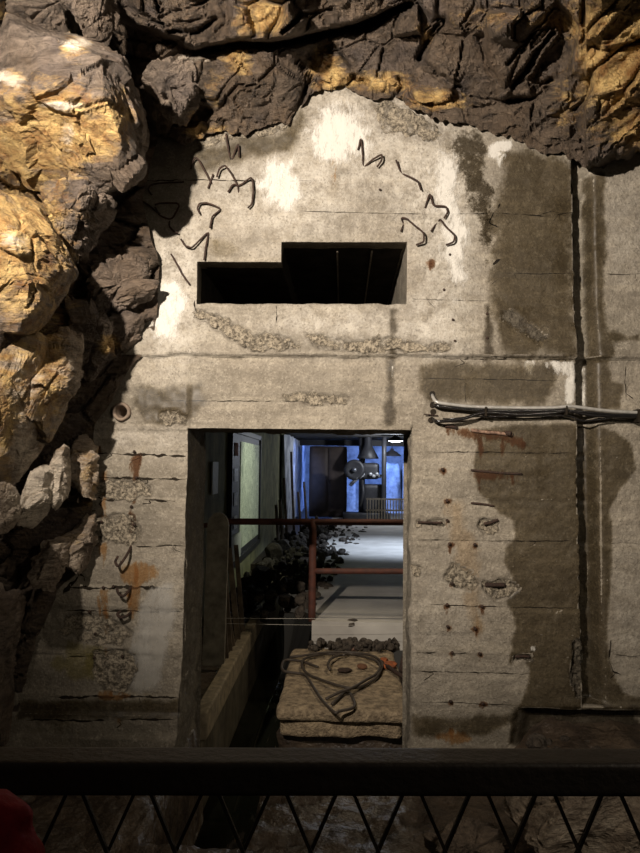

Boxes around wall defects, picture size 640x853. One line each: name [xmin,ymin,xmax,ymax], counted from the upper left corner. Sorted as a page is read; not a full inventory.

water stain [435,133,512,283]
spalling [193,309,300,353]
water stain [484,307,492,354]
spalling [159,411,187,426]
spalling [282,392,348,406]
efflorescence [552,361,585,404]
spalling [97,479,152,503]
spalling [94,513,142,547]
spalling [444,562,518,602]
spalling [59,613,138,692]